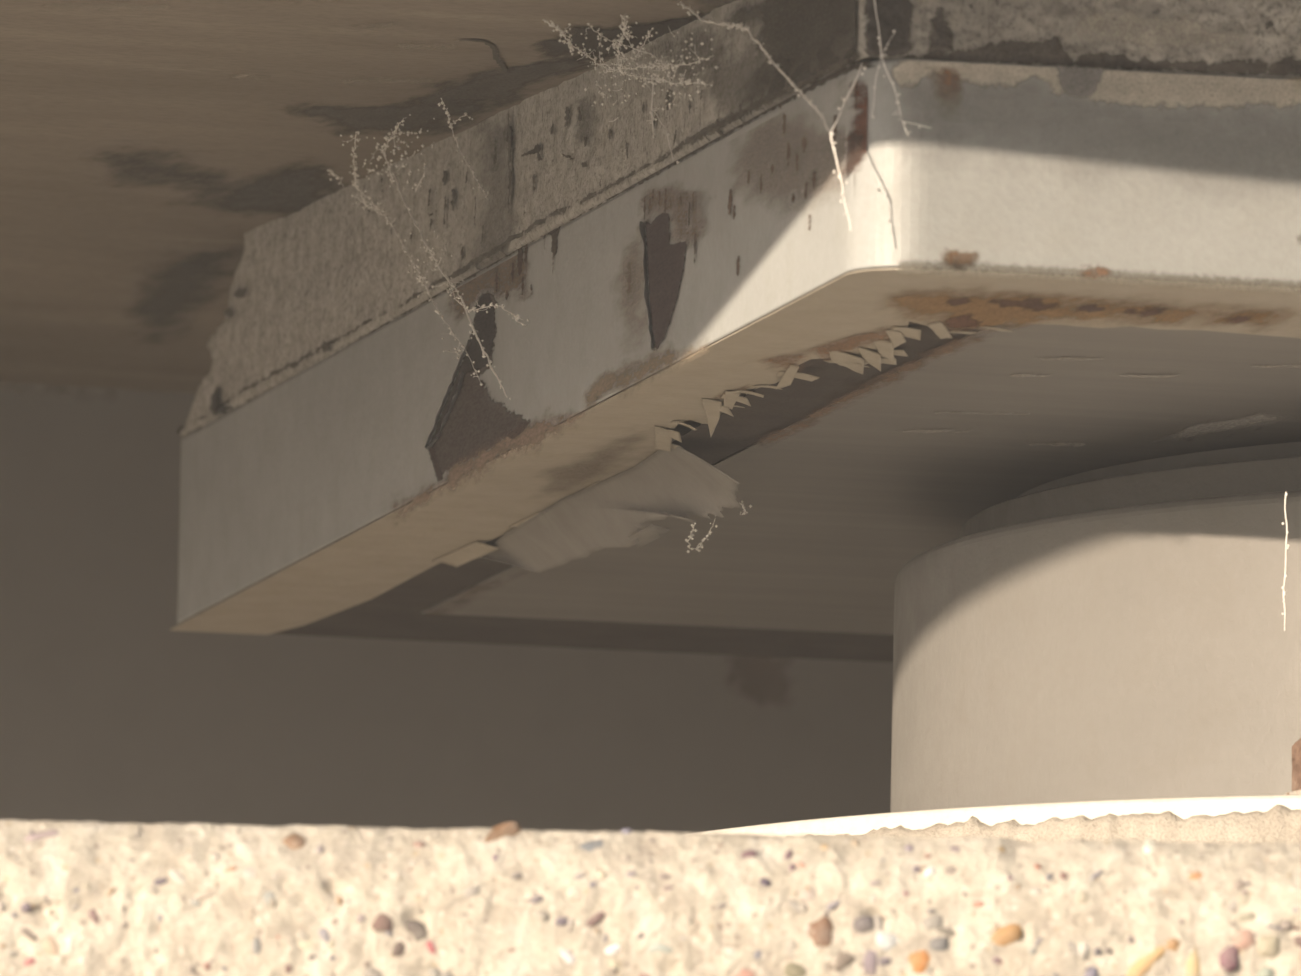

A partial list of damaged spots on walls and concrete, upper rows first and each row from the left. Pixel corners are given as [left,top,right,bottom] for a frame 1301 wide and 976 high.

peeling [639,213,686,352]
peeling [170,268,1301,635]